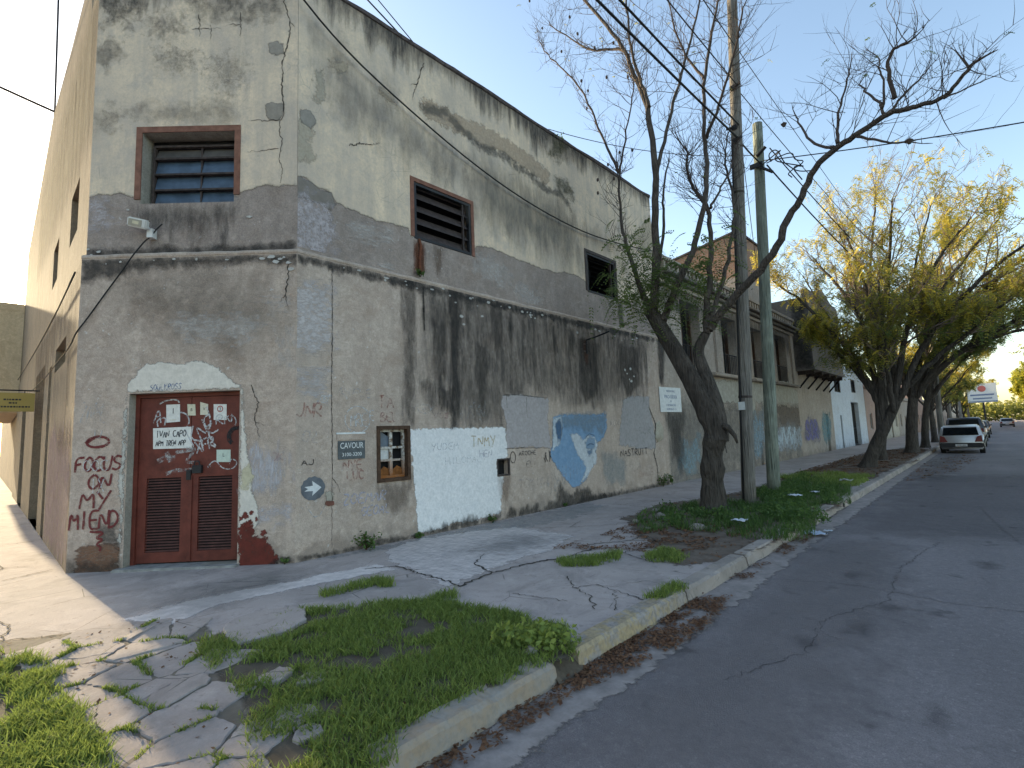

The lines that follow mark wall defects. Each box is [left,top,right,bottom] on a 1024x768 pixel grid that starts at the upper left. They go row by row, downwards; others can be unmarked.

crack [249,0,294,182]
water stain [425,106,569,204]
corrosion [414,242,424,273]
water stain [404,288,664,426]
peeling [74,360,279,573]